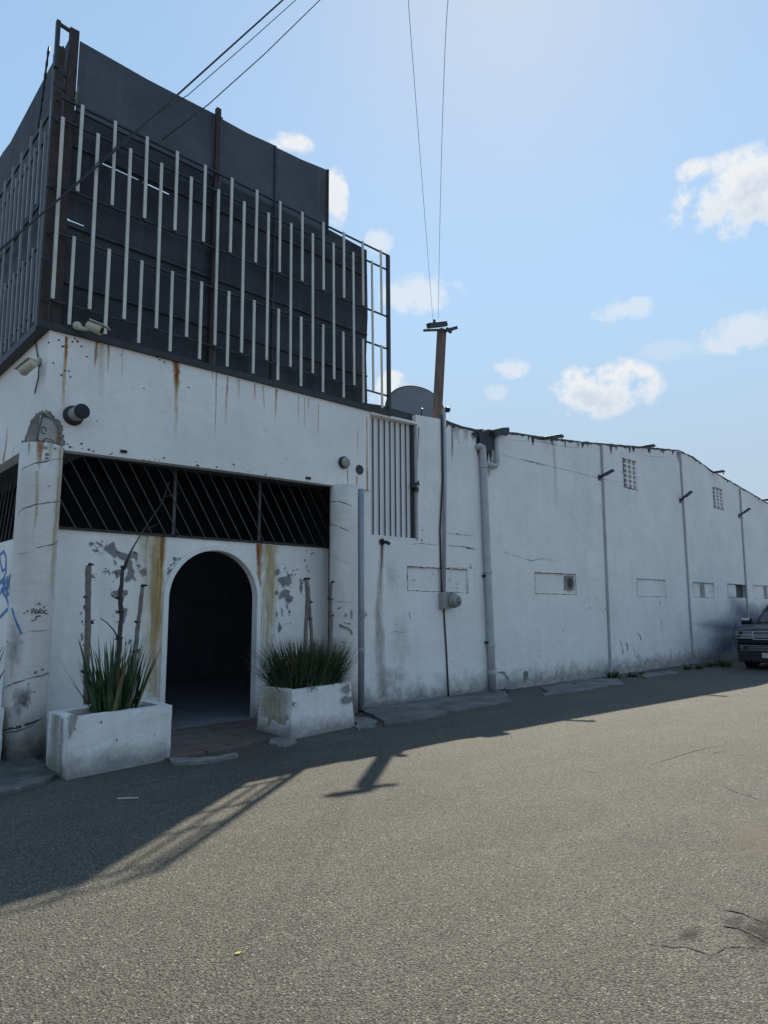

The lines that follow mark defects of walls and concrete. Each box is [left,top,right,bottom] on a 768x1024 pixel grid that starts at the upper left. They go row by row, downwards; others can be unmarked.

spalling [22,410,95,460]
rust [28,433,62,557]
peeling [89,541,147,624]
rust [149,536,165,663]
rust [257,544,274,637]
peeling [273,550,314,638]